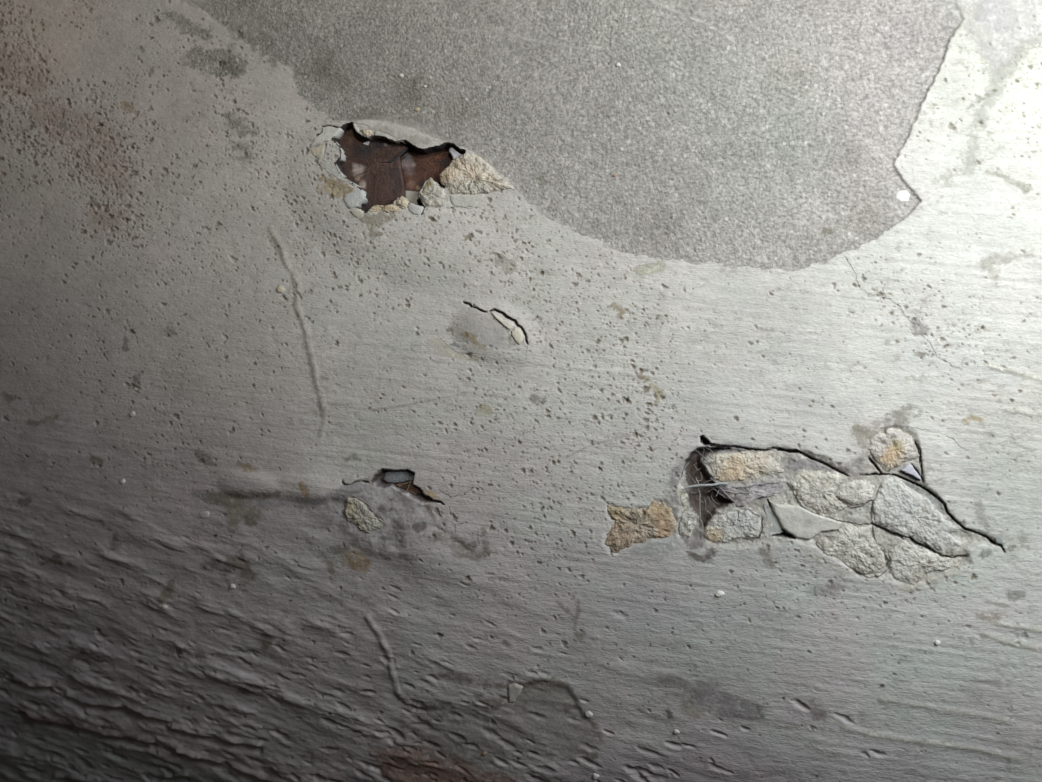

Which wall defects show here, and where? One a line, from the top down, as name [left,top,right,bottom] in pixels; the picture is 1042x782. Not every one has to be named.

peeling [164,0,963,271]
spalling [192,469,490,561]
spalling [605,405,1016,599]